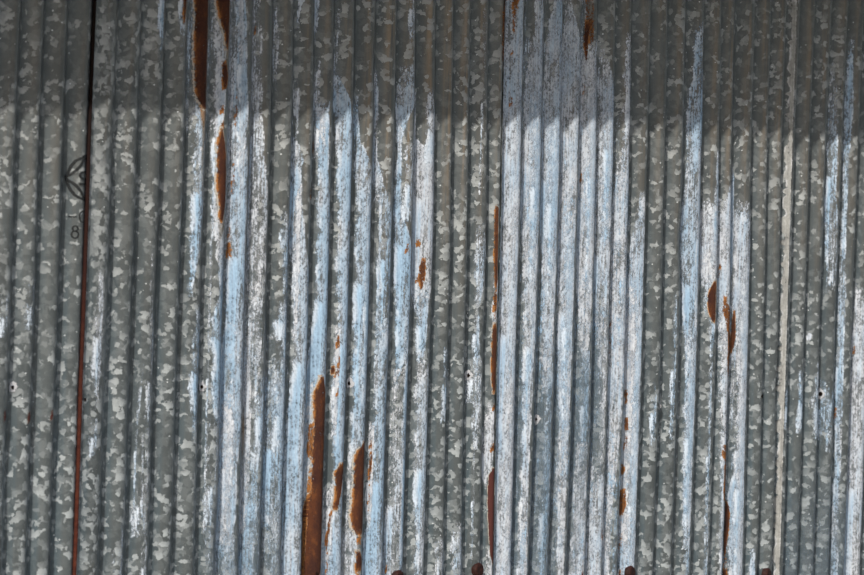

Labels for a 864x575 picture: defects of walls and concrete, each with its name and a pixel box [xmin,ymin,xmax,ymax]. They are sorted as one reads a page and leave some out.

corrosion [182,0,230,125]
corrosion [583,0,594,60]
corrosion [214,96,238,259]
corrosion [415,258,426,290]
corrosion [490,206,499,411]
corrosion [706,264,736,372]
corrosion [301,335,372,575]
corrosion [487,467,495,564]